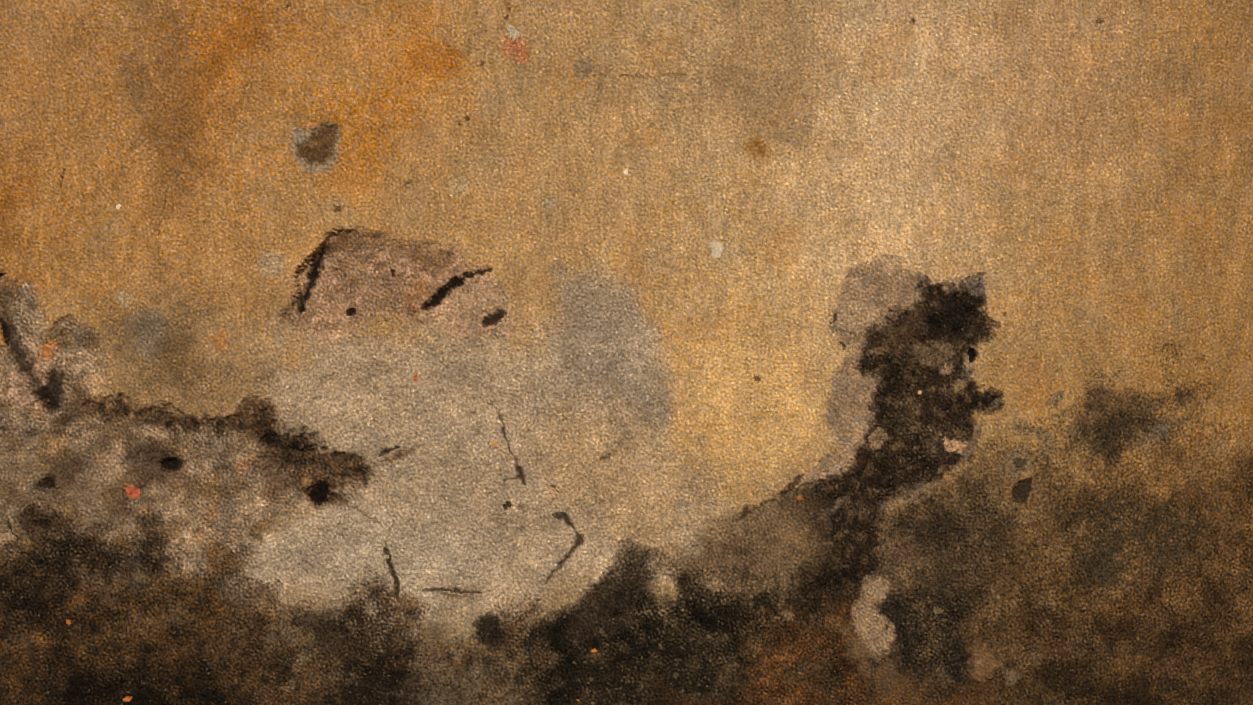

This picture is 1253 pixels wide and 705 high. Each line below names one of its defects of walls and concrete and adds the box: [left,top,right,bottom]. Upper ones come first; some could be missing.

spalling [289,119,342,175]
spalling [0,224,742,640]
damp [0,272,1253,705]
spalling [792,255,990,501]